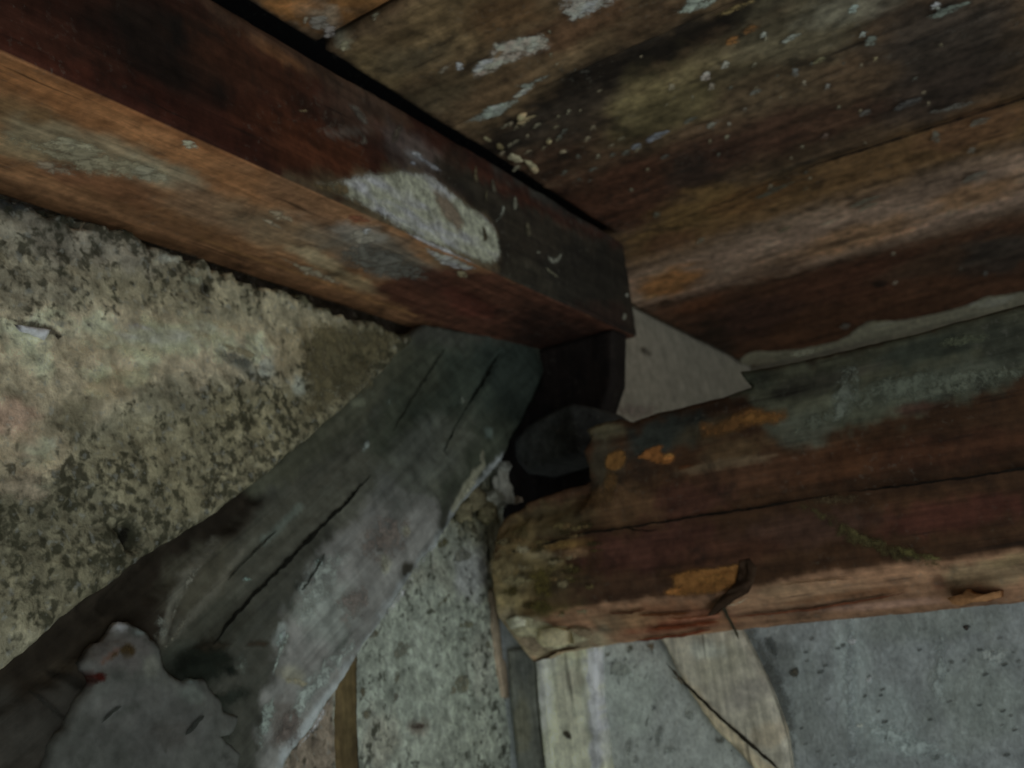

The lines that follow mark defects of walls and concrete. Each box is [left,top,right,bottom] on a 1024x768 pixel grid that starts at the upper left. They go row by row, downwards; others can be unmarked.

leakage [11,135,169,181]
leakage [426,248,475,277]
crack [444,354,499,451]
crack [213,476,370,645]
crack [487,467,1024,562]